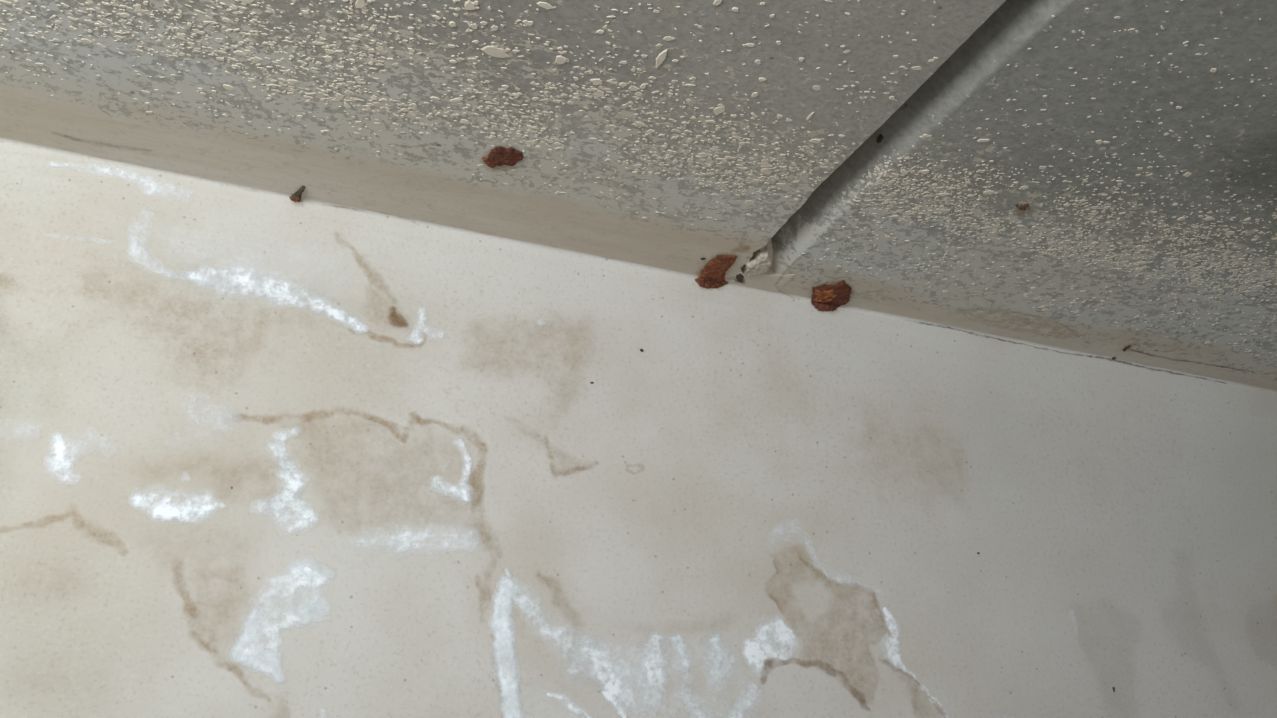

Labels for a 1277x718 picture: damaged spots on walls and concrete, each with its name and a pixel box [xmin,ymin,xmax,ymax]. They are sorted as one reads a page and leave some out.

peeling [0,0,938,230]
corrosion [482,146,524,168]
leakage [189,266,368,332]
corrosion [695,254,737,289]
corrosion [811,280,851,312]
leakage [130,493,225,522]
leakage [257,428,318,532]
leakage [432,439,475,501]
leakage [233,563,328,682]
leakage [491,569,709,718]
leakage [708,618,797,718]
leakage [883,607,949,718]